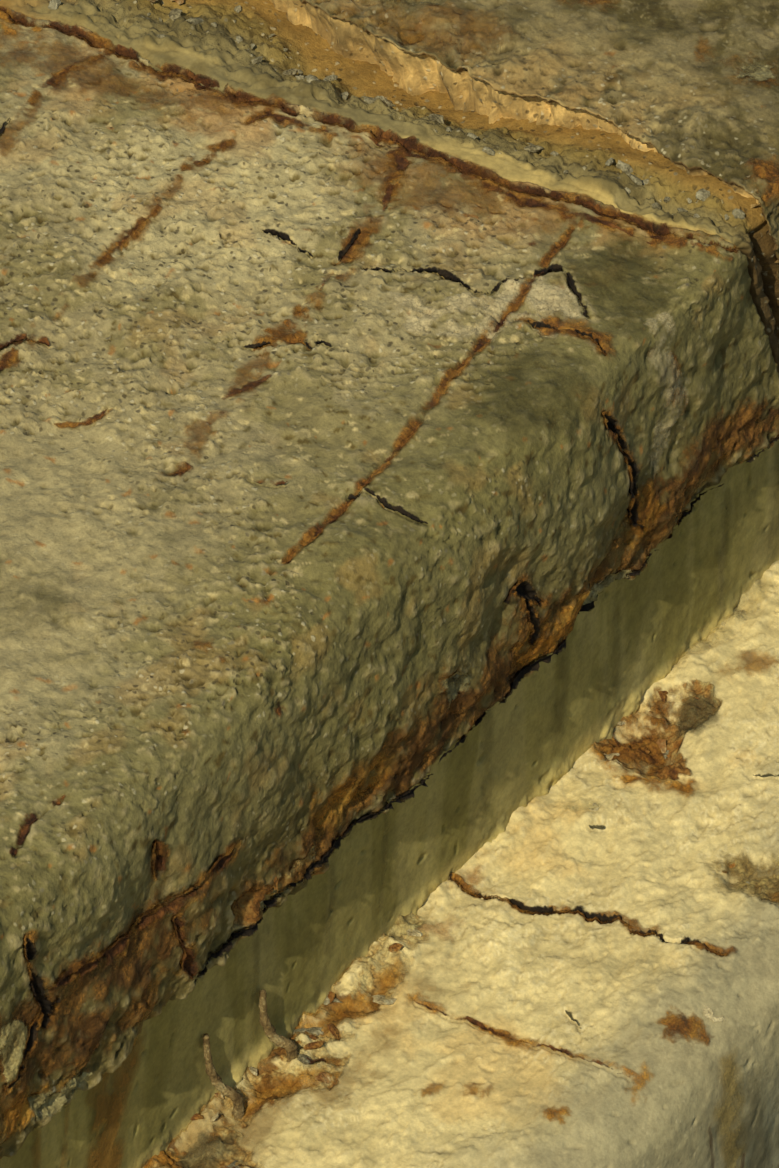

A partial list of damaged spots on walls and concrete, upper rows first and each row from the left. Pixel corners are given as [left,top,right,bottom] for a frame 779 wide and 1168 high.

rust [0,48,337,150]
crack [0,0,779,373]
rust [369,137,732,411]
crack [746,437,779,463]
rust [267,398,779,876]
crack [172,410,736,982]
spalling [592,679,722,795]
spalling [714,855,779,902]
spalling [0,1020,28,1085]
spalling [144,913,428,1168]
crack [408,994,639,1082]
rust [658,1012,710,1045]